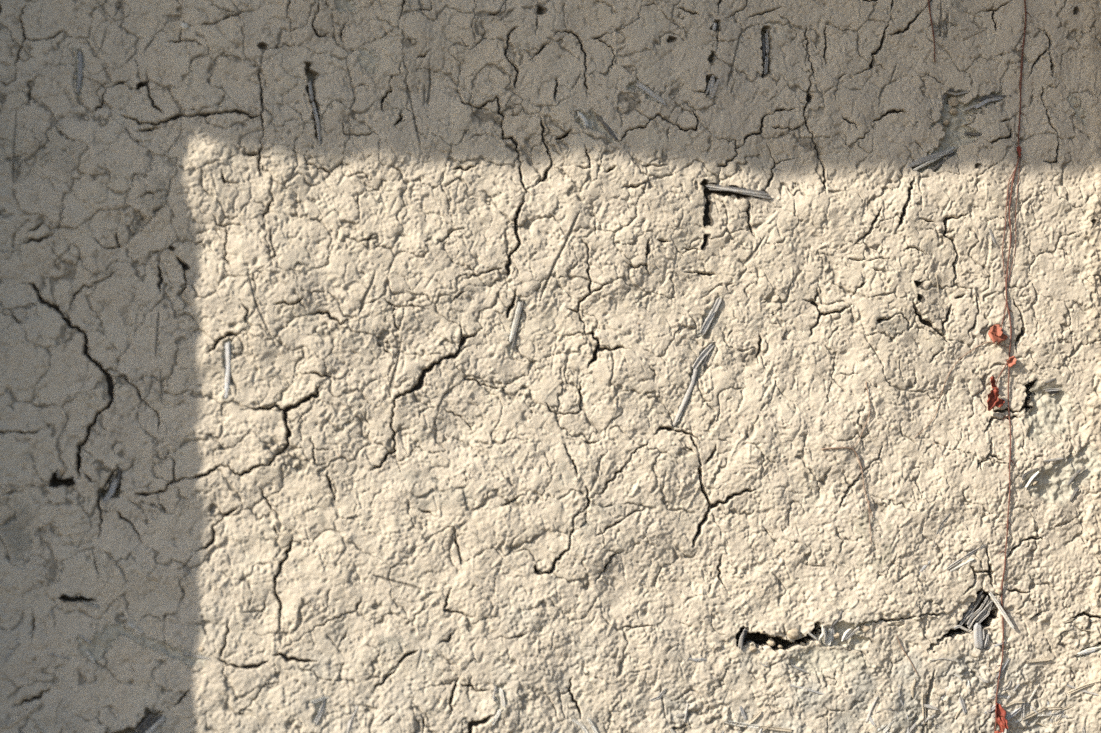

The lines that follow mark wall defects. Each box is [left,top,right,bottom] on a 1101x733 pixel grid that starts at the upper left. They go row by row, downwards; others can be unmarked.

crack [88,62,296,274]
crack [372,0,932,470]
crack [805,176,979,361]
crack [24,233,363,715]
crack [537,224,754,578]
crack [840,445,883,507]
crack [977,408,1021,470]
crack [374,586,480,690]
crack [872,537,1044,623]
crack [1071,612,1101,648]
crack [422,679,490,733]
crack [563,677,581,718]